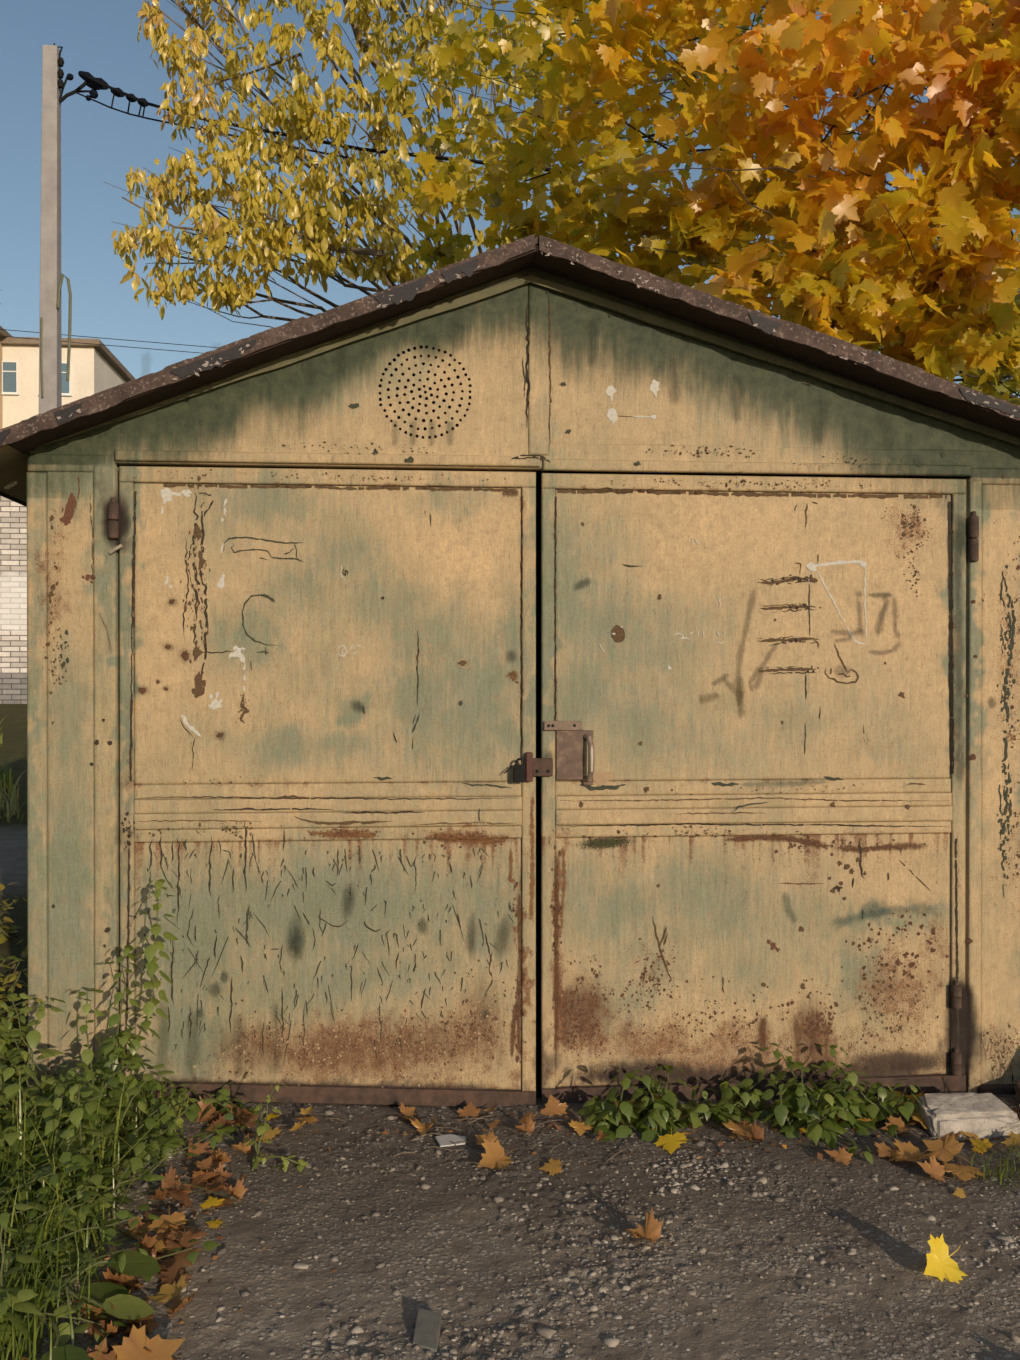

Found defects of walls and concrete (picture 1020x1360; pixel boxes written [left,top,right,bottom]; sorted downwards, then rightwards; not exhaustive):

rust [59,493,77,526]
spalling [161,470,203,514]
peeling [221,537,303,562]
peeling [164,499,227,710]
spalling [228,646,246,692]
rust [672,825,926,900]
rust [193,797,535,1087]
rust [550,830,624,1061]
rust [781,978,838,1039]